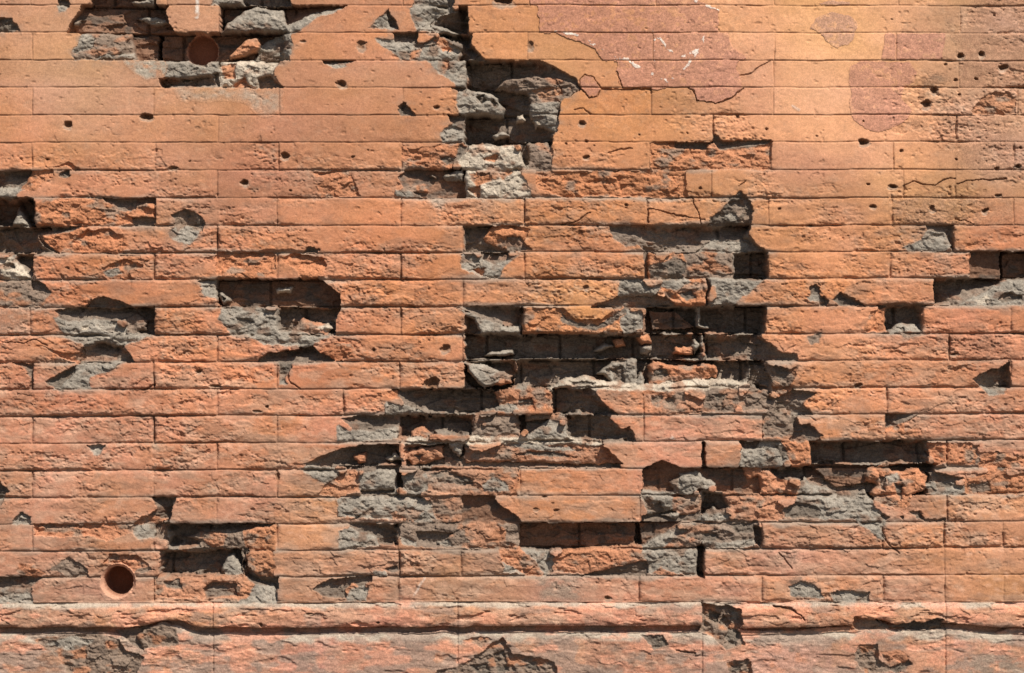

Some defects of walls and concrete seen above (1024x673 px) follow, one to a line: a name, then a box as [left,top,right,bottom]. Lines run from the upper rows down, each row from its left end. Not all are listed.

spalling [57,0,346,90]
spalling [324,0,773,207]
crack [688,61,771,104]
crack [903,178,1007,187]
spalling [0,159,156,392]
spalling [199,247,356,386]
spalling [298,191,1024,579]
spalling [0,496,279,605]
spalling [436,636,557,673]
spalling [700,602,753,673]